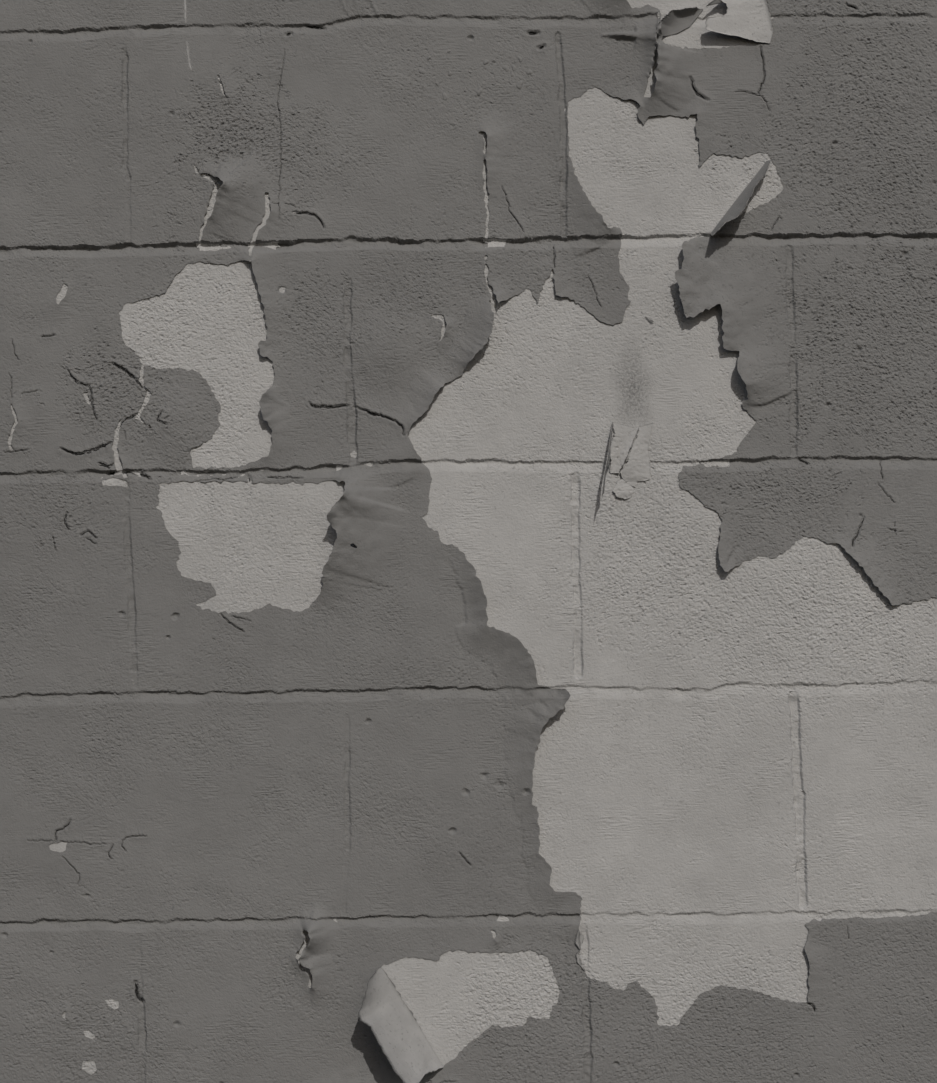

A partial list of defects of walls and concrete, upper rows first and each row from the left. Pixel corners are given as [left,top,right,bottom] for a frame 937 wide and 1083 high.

crack [61,369,165,479]
crack [112,363,143,388]
peeling [119,151,405,613]
peeling [382,0,937,1026]
crack [55,822,137,881]
peeling [286,907,337,1006]
peeling [358,915,560,1083]